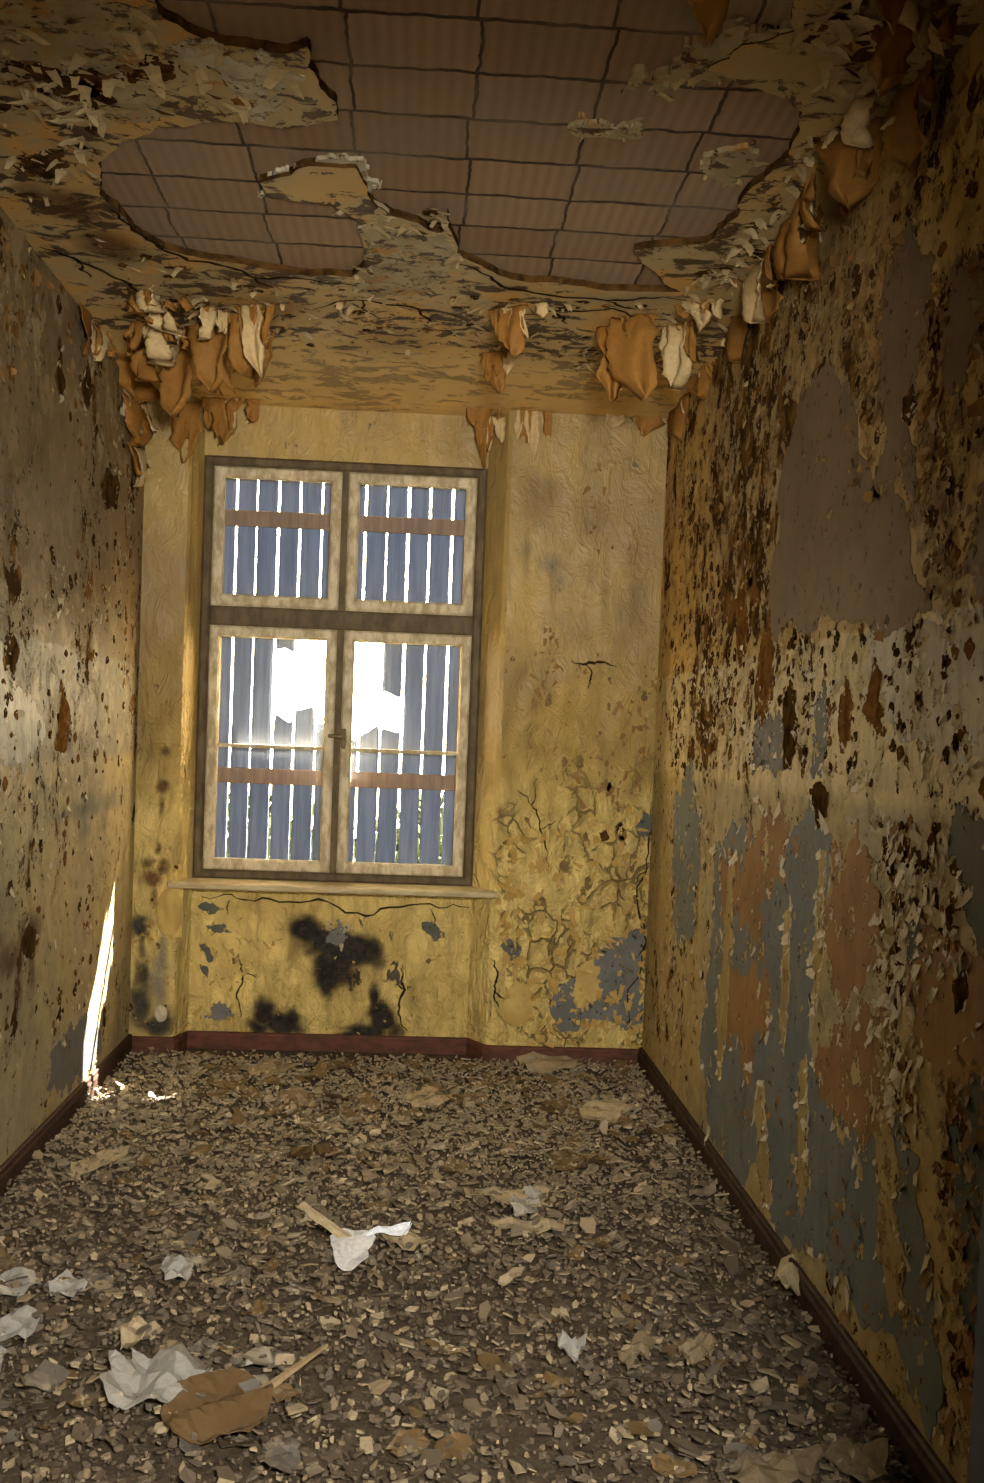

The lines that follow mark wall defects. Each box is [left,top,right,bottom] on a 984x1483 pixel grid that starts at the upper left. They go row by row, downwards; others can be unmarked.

peeling [0,217,421,540]
peeling [420,295,590,394]
peeling [466,407,552,468]
peeling [40,532,128,644]
peeling [521,627,599,712]
peeling [0,633,131,895]
peeling [494,666,658,1049]
peeling [752,795,787,826]
peeling [7,877,41,961]